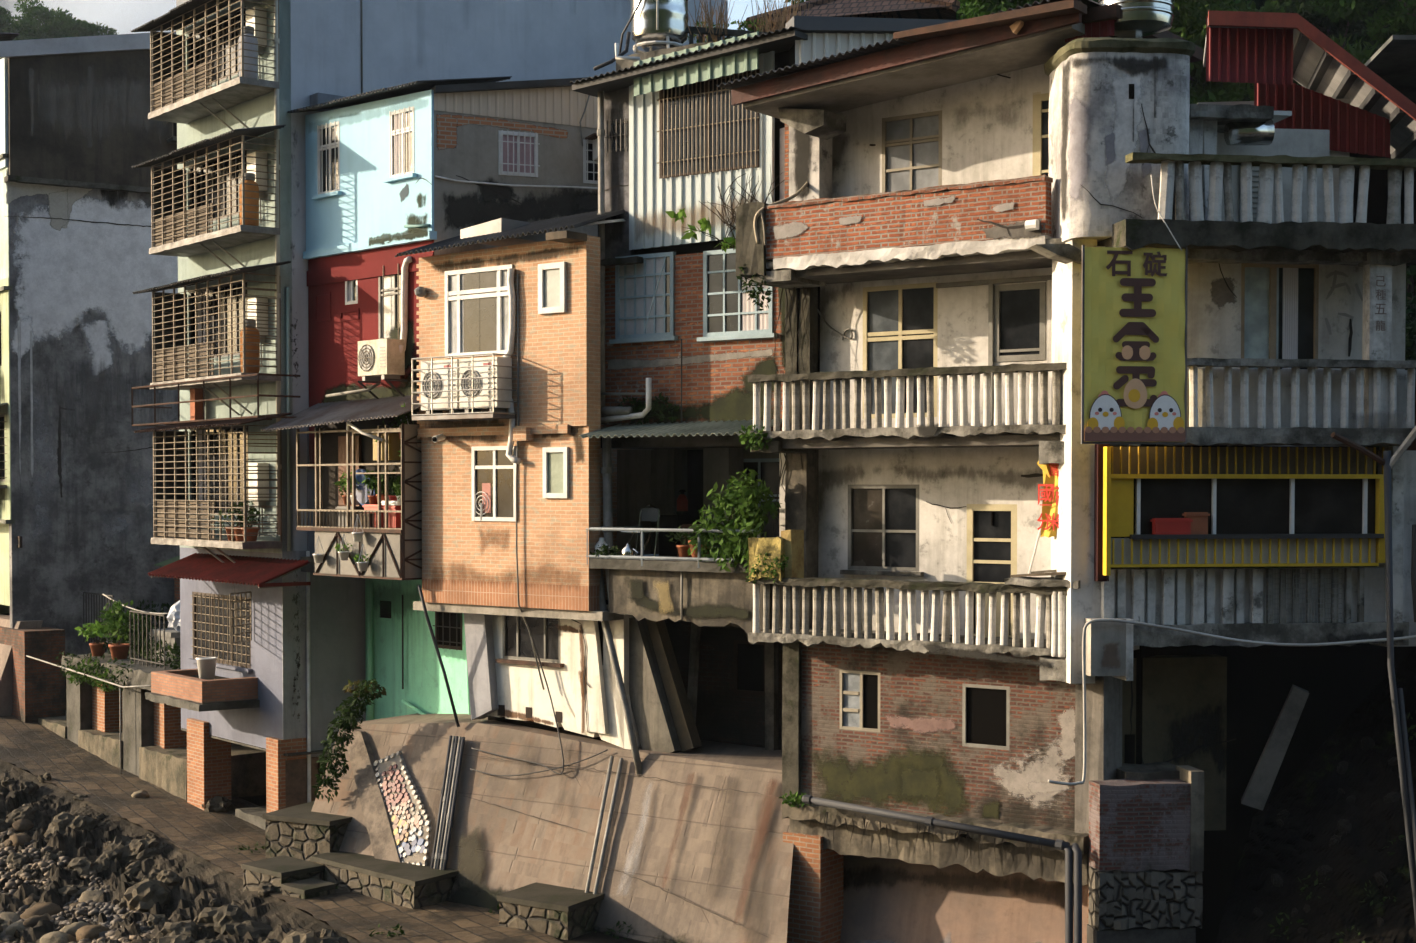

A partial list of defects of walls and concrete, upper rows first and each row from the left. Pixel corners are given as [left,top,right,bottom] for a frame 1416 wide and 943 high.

crack [1141,104,1156,164]
water stain [444,107,624,241]
water stain [369,194,428,246]
peeling [839,215,862,225]
crack [1080,184,1143,218]